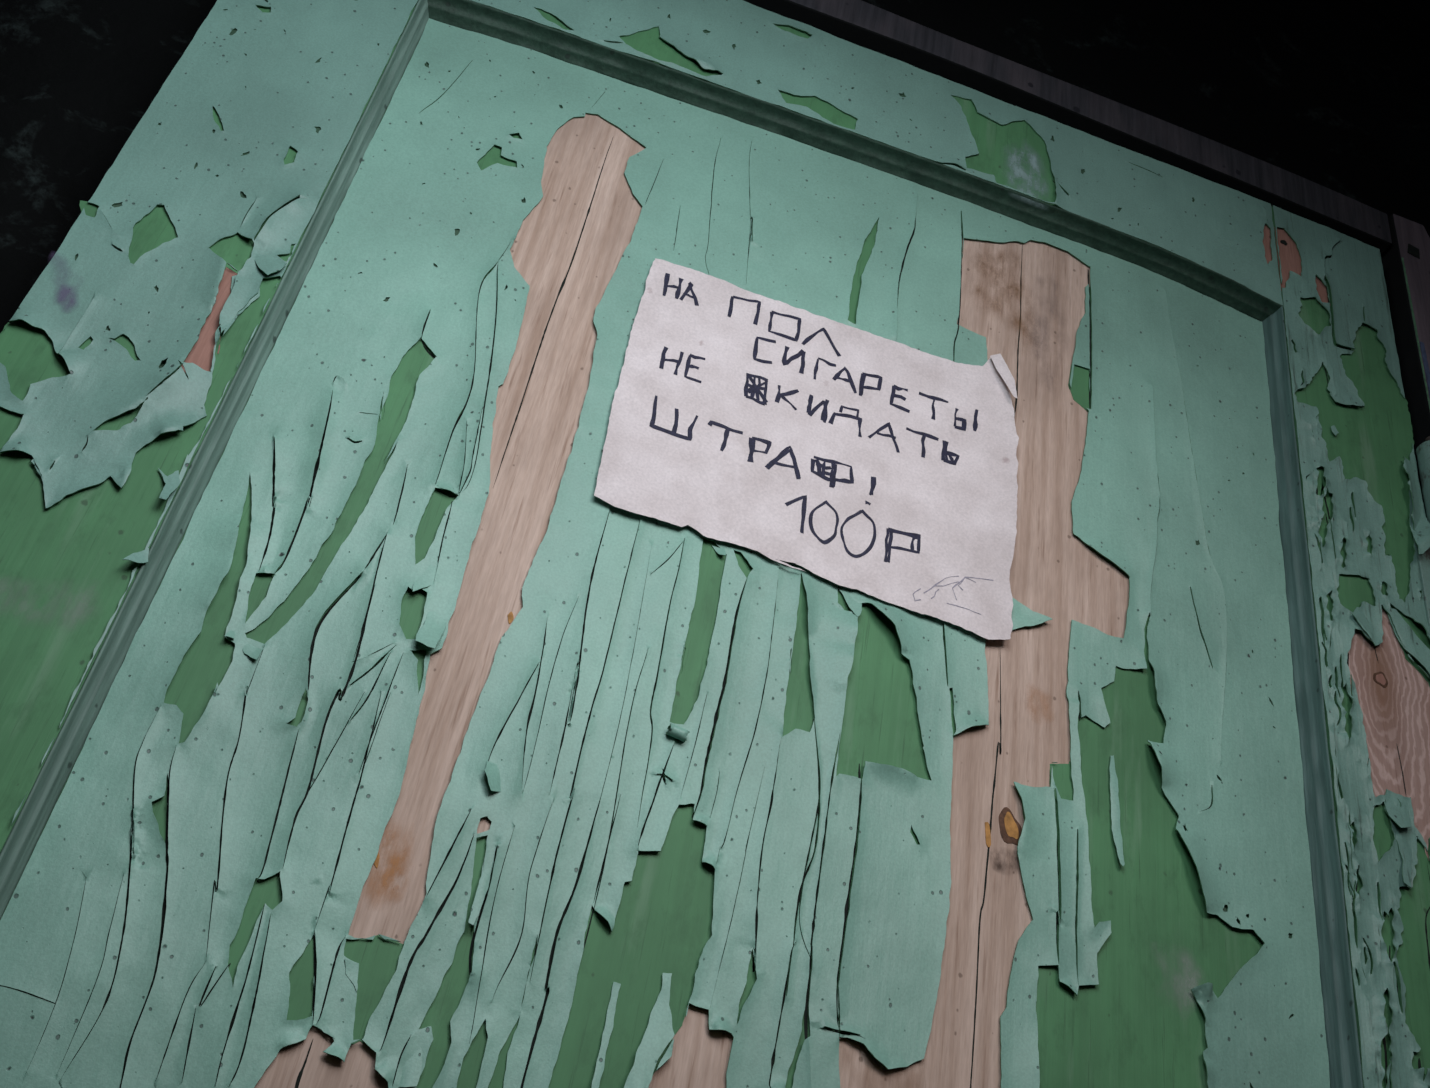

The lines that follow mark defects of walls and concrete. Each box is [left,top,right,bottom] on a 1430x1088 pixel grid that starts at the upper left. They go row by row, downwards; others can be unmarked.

peeling [128,205,178,264]
peeling [848,218,879,324]
peeling [952,96,1056,206]
peeling [0,233,298,853]
peeling [164,338,436,743]
peeling [254,106,645,1088]
peeling [666,539,753,742]
peeling [782,576,815,737]
peeling [832,238,1265,1088]
peeling [1292,324,1430,1088]
peeling [228,872,282,985]
peeling [548,804,756,1088]